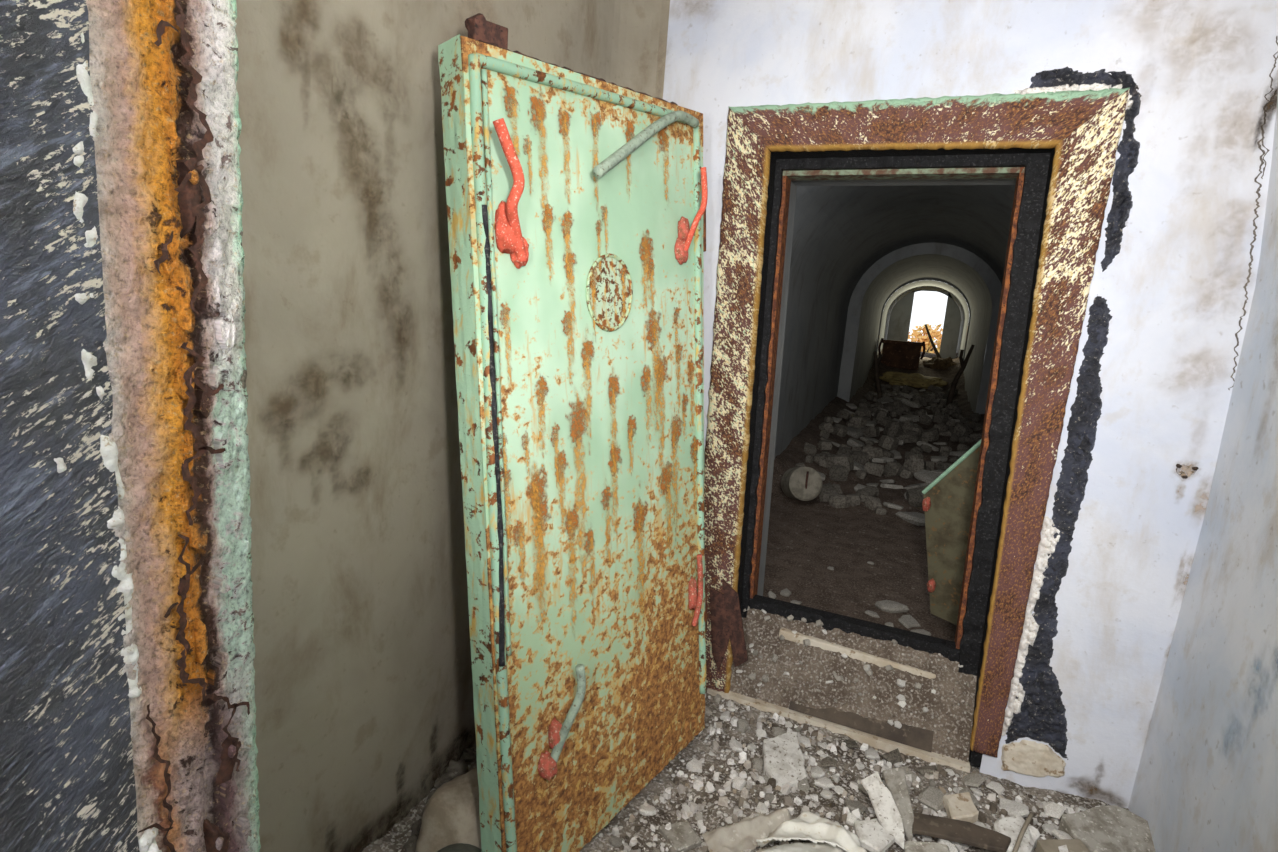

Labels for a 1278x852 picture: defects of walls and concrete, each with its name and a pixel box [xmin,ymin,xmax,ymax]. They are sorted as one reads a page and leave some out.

flaking render [1013,83,1133,110]
rust [153,115,178,149]
rust [201,196,220,235]
rust [159,229,181,276]
rust [172,274,236,349]
rust [174,363,232,419]
rust [183,430,193,471]
rust [214,432,229,469]
rust [189,522,208,549]
rust [710,580,748,671]
rust [177,617,231,690]